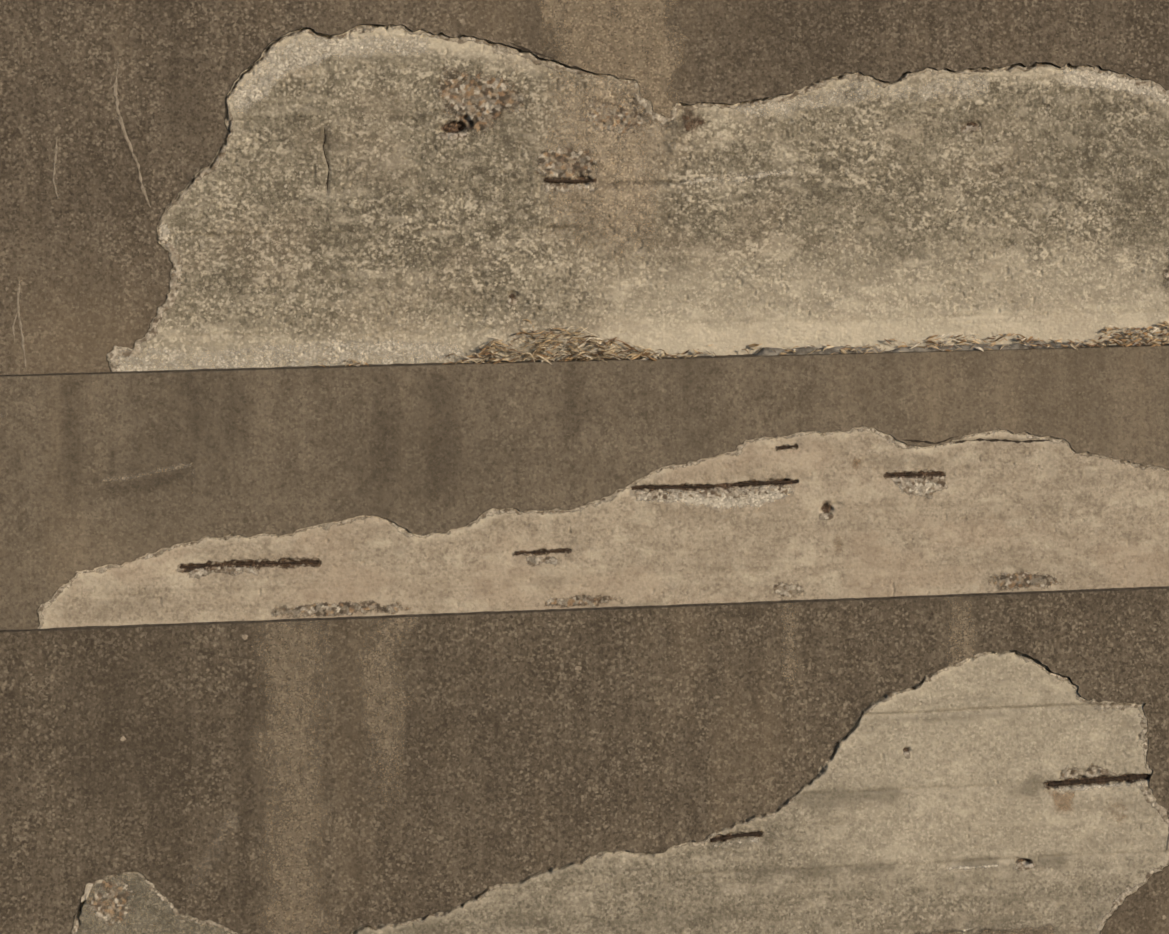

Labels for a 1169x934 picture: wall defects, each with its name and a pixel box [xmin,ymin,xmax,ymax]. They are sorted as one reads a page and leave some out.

spalling [107,19,1169,372]
spalling [38,426,1169,629]
spalling [72,872,239,934]
spalling [351,650,1169,934]